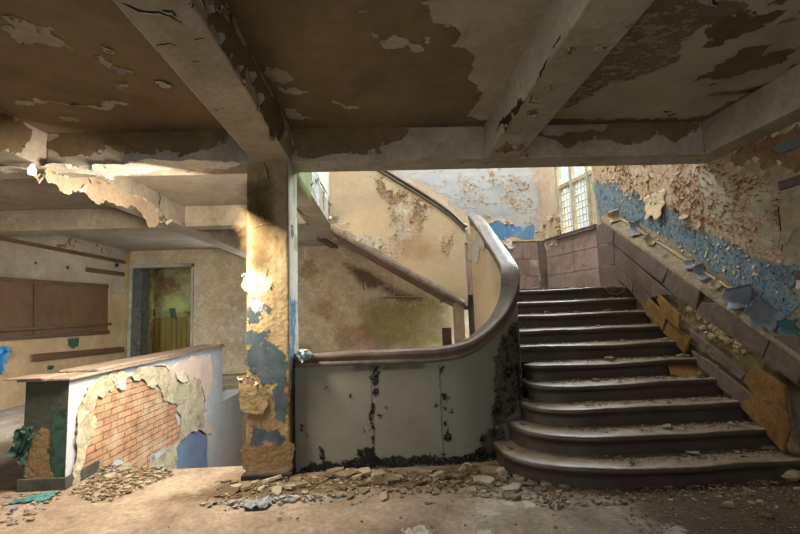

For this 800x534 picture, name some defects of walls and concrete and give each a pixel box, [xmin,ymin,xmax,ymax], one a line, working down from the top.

crack [121,0,206,24]
peeling [206,4,410,160]
peeling [421,0,550,120]
peeling [537,0,800,148]
peeling [0,113,240,228]
water stain [244,184,270,267]
peeling [391,168,560,249]
peeling [592,122,800,337]
flaking render [2,354,213,486]
peeling [240,269,313,471]
water stain [291,356,308,446]
water stain [300,366,496,472]